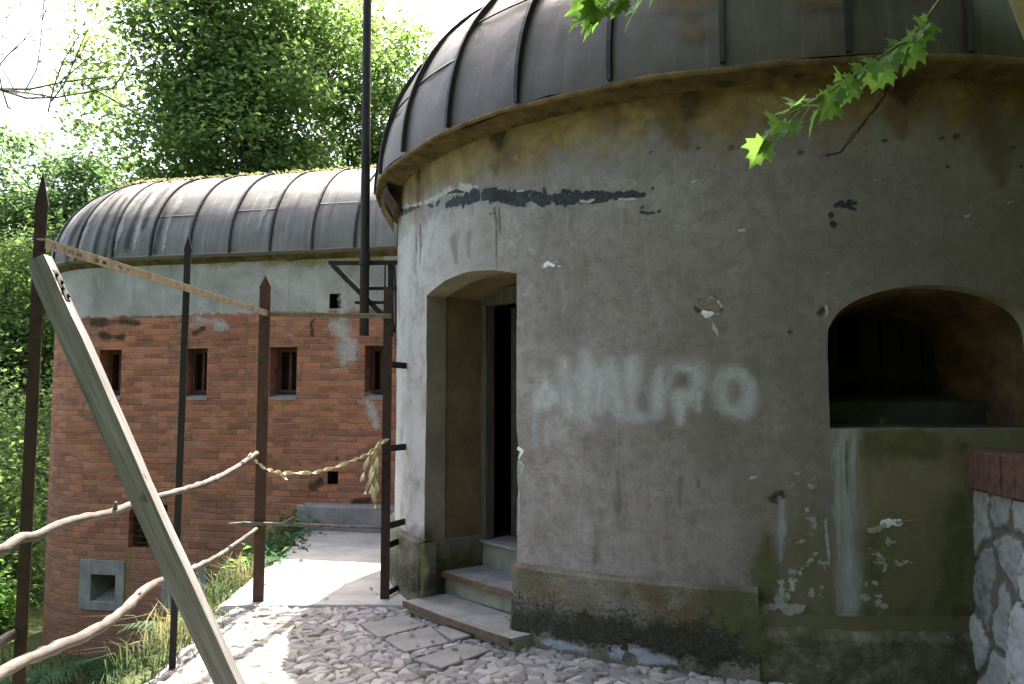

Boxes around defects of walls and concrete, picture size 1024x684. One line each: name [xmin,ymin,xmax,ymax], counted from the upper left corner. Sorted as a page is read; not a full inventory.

peeling [398,183,661,218]
spalling [694,297,723,336]
peeling [761,507,831,616]
damp [832,429,861,616]
peeling [857,518,915,614]